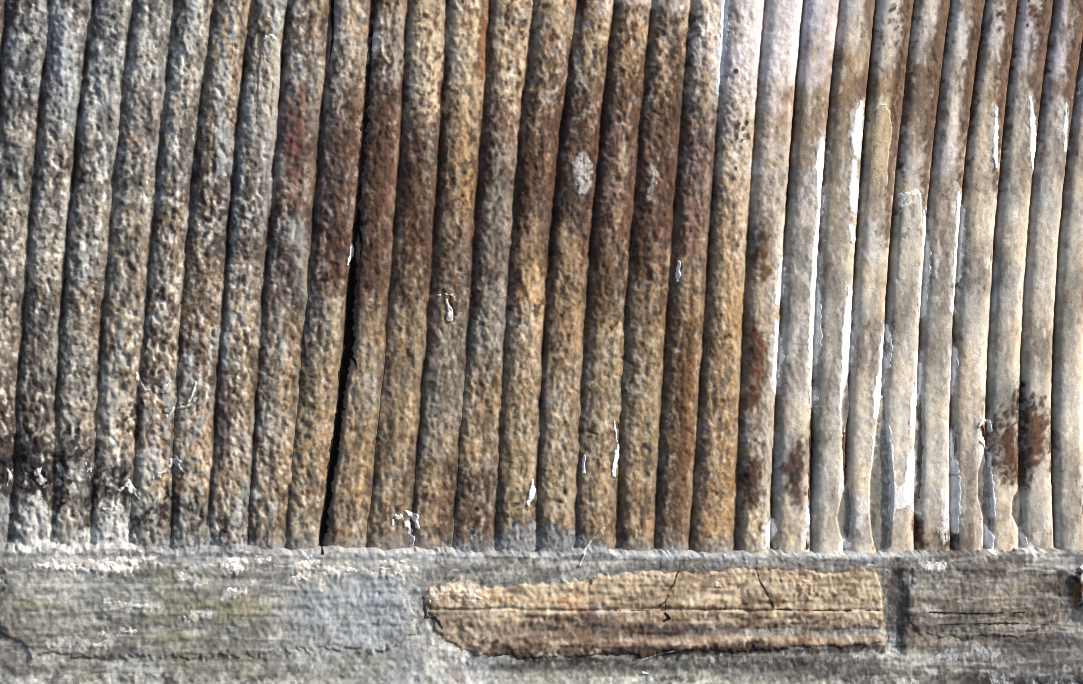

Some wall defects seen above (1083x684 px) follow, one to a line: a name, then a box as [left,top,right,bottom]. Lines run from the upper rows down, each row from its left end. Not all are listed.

spalling [1021,92,1041,173]
crack [318,0,375,555]
spalling [769,252,790,393]
spalling [798,137,858,556]
peeling [845,100,932,321]
spalling [948,182,966,317]
damp [0,423,174,531]
damp [116,398,144,437]
spalling [866,321,928,550]
spalling [939,424,964,538]
spalling [978,451,1043,562]
corrosion [985,381,1053,490]